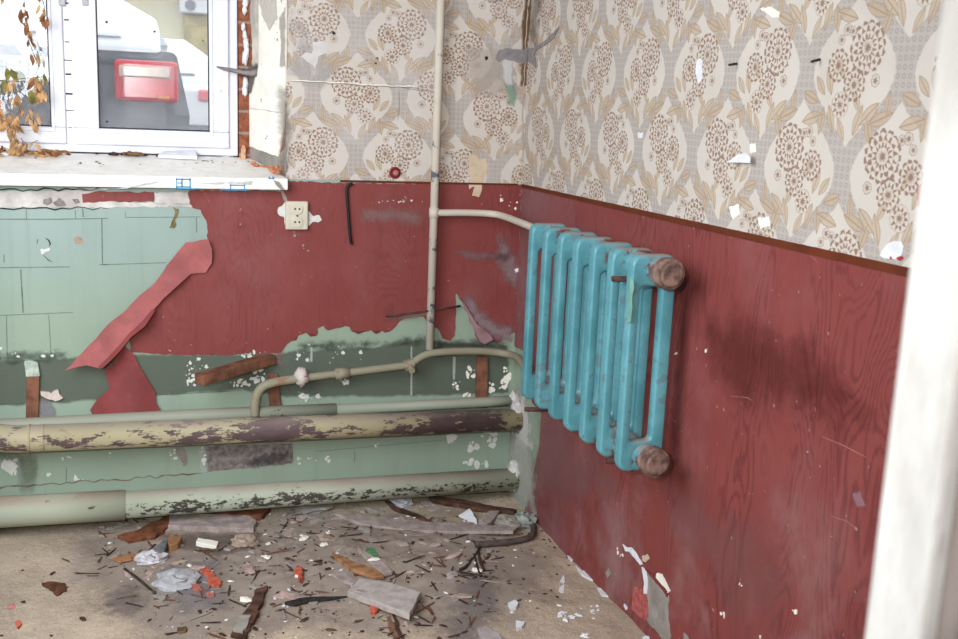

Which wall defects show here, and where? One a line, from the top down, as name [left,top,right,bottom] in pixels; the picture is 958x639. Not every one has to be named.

flaking render [259,0,282,41]
flaking render [0,181,192,209]
flaking render [273,180,287,223]
flaking render [308,211,322,226]
peeling [230,368,265,387]
peeling [452,366,476,397]
peeling [488,366,512,393]
peeling [1,458,19,475]
spalling [169,443,331,473]
peeling [462,431,498,469]
peeling [656,573,671,593]